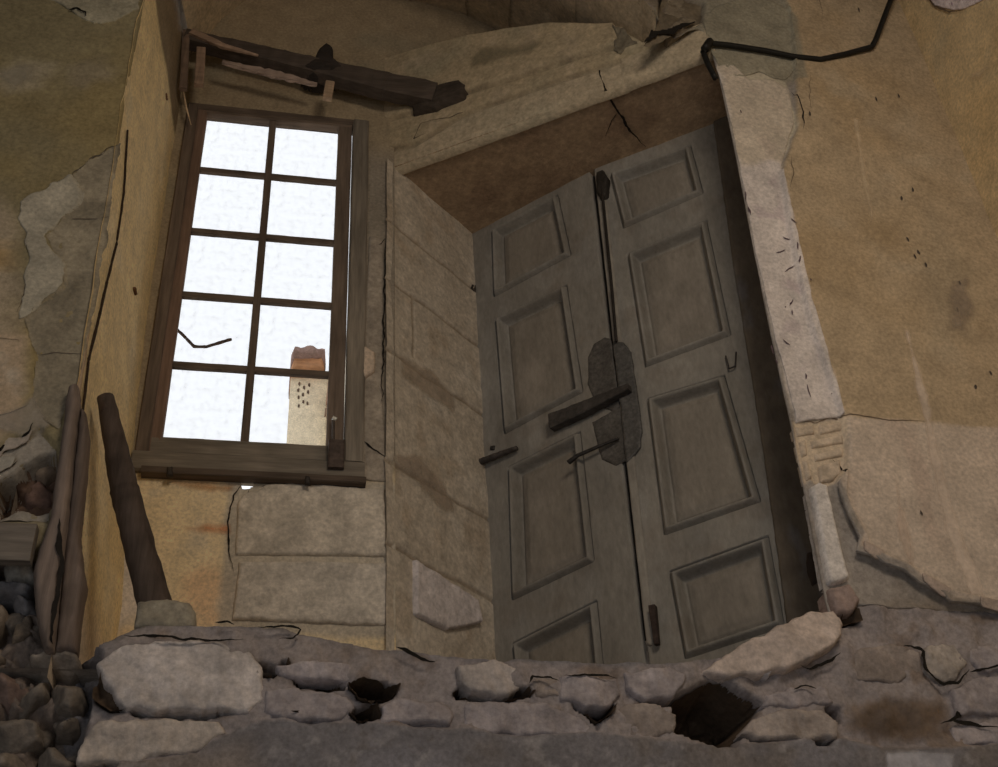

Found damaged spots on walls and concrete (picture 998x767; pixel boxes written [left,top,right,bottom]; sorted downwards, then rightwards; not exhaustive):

flaking render [52,0,140,24]
peeling [929,0,982,13]
crack [599,70,646,147]
flaking render [0,143,121,522]
flaking render [802,470,998,612]
spalling [841,607,863,626]